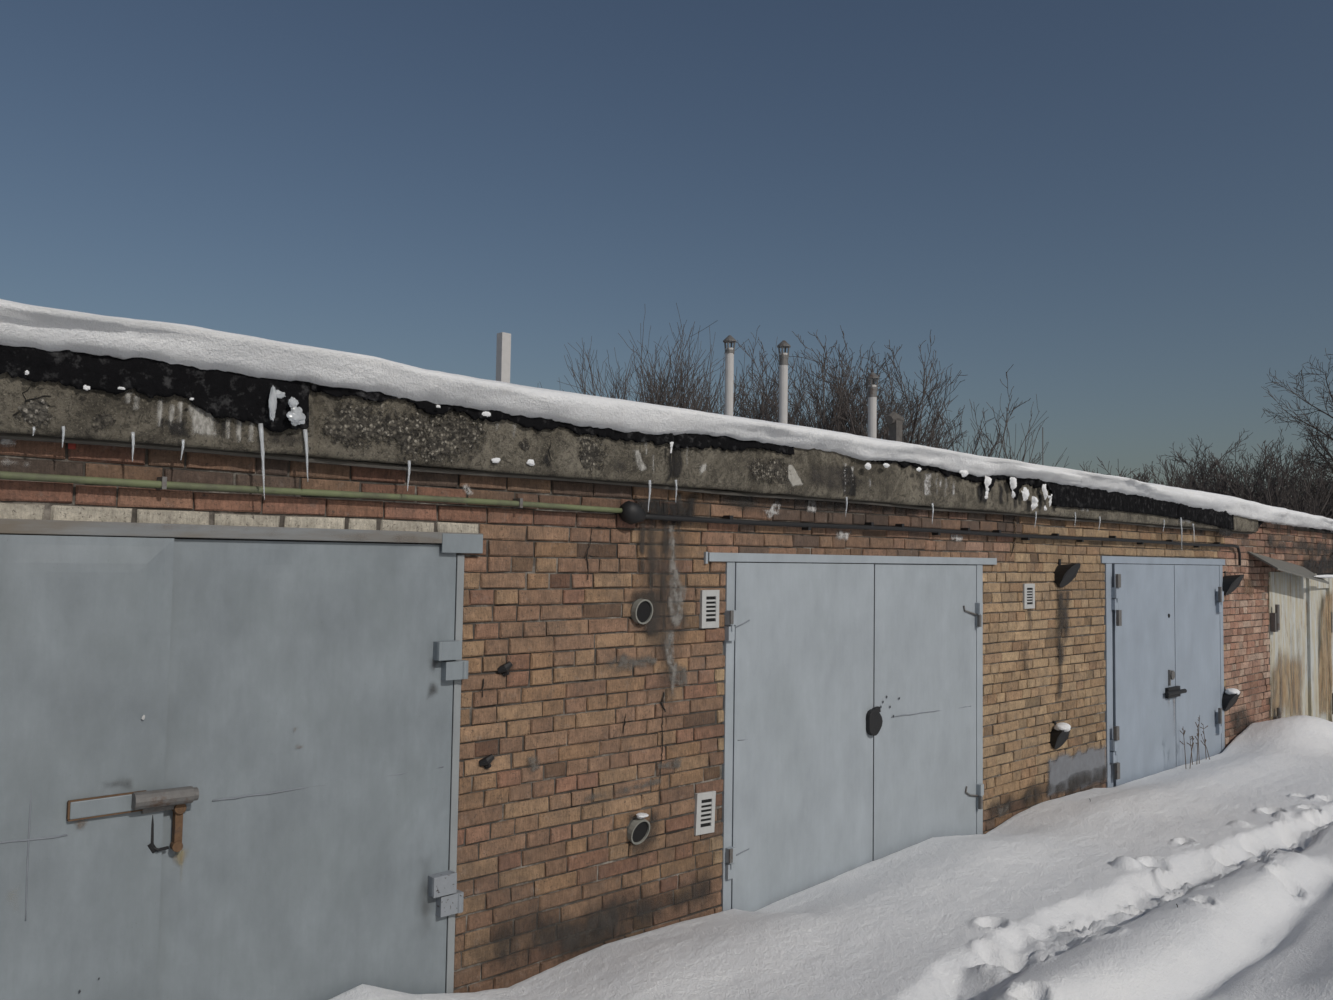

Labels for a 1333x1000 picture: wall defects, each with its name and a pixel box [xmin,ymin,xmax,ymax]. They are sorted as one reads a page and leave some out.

leakage [619,446,688,479]
leakage [712,465,915,517]
leakage [977,485,1017,507]
leakage [637,494,696,657]
leakage [496,901,660,963]